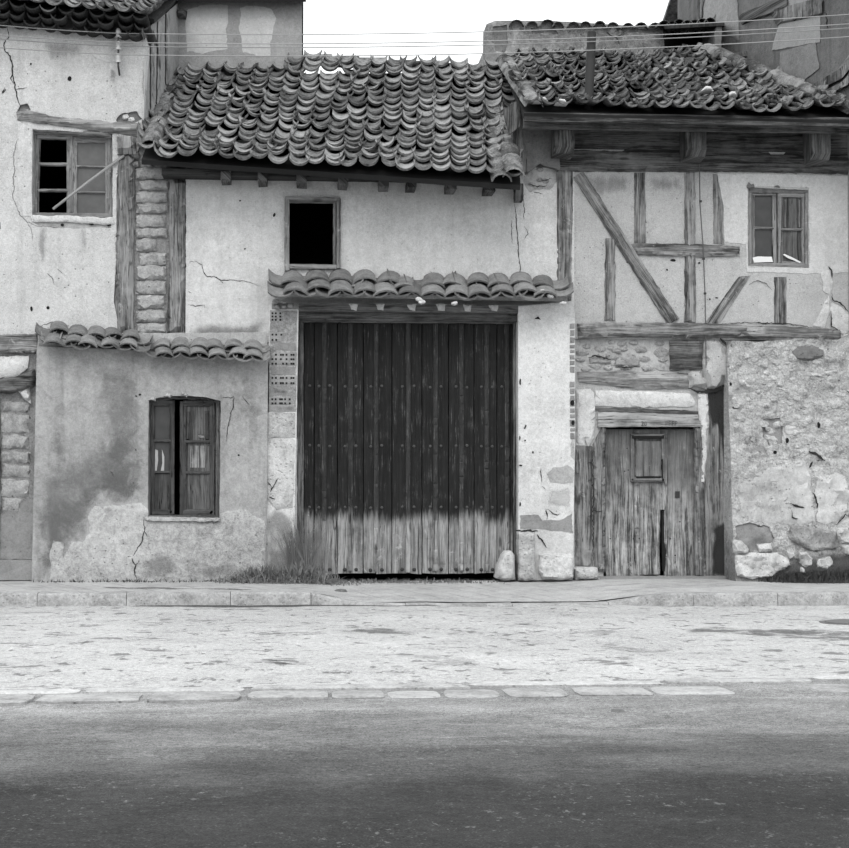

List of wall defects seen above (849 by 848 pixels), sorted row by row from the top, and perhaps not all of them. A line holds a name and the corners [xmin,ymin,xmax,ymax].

crack [2,29,24,108]
peeling [814,473,849,524]
crack [132,520,147,578]
spalling [735,522,774,551]